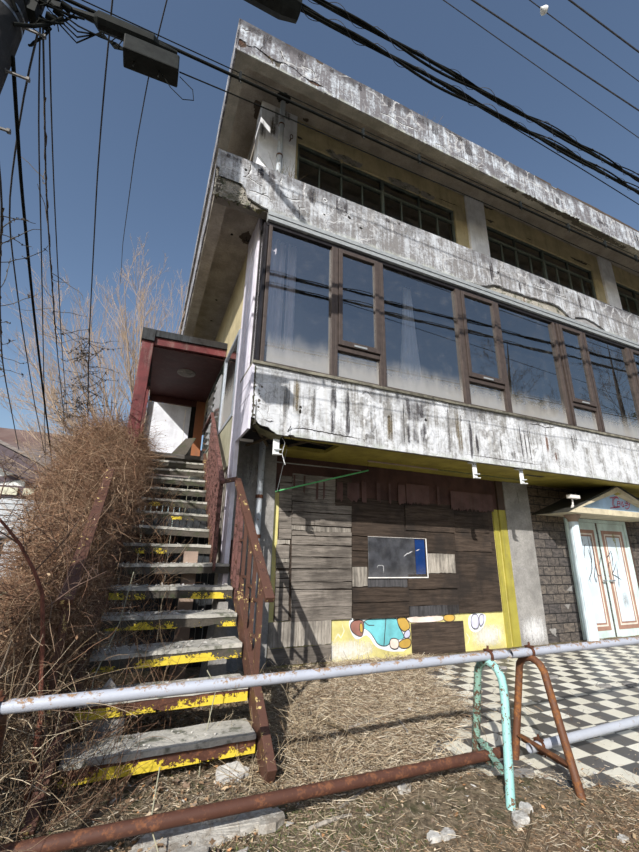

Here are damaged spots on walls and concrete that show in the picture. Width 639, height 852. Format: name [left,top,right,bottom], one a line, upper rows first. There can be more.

crack [242,27,316,77]
leakage [254,100,275,134]
spalling [213,168,266,215]
leakage [331,381,350,433]
leakage [388,399,425,442]
leakage [448,416,479,456]